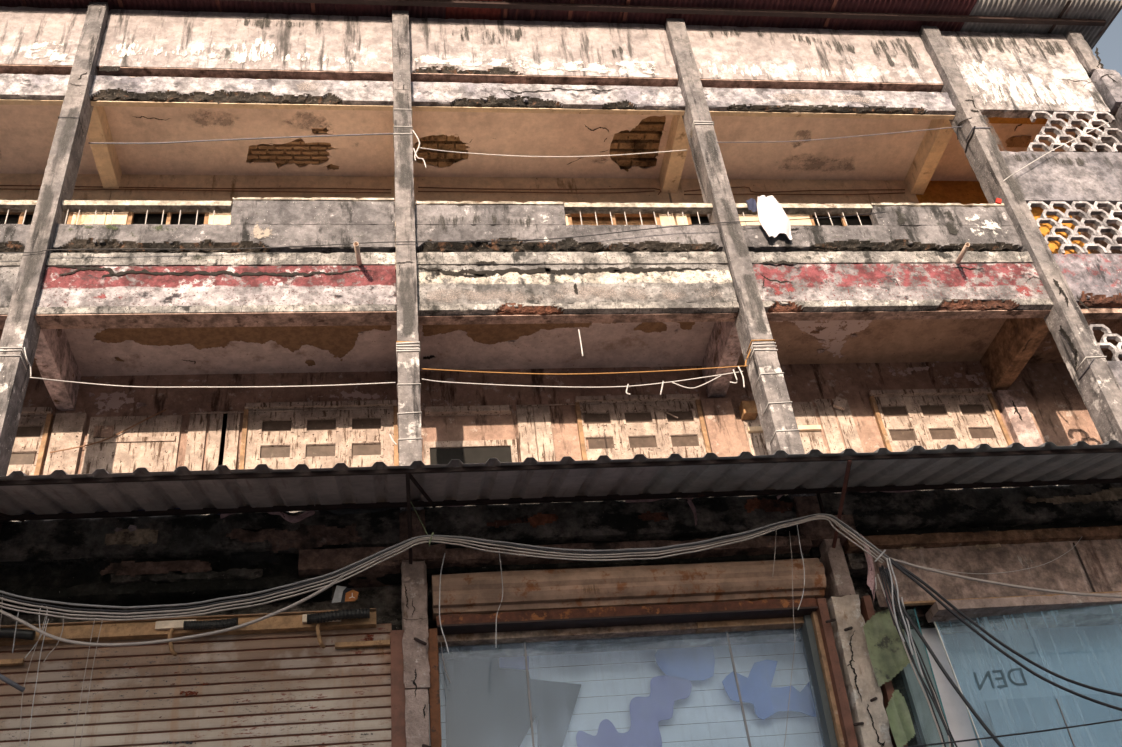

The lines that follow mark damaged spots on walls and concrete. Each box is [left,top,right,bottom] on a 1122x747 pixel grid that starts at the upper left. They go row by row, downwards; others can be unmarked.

water stain [24,41,68,63]
water stain [106,18,373,65]
spalling [91,88,343,105]
spalling [727,104,928,115]
spalling [246,126,339,172]
spalling [413,133,471,167]
spalling [602,99,666,172]
crack [52,239,712,294]
peeling [93,325,391,366]
peeling [768,301,872,358]
crack [847,631,885,747]